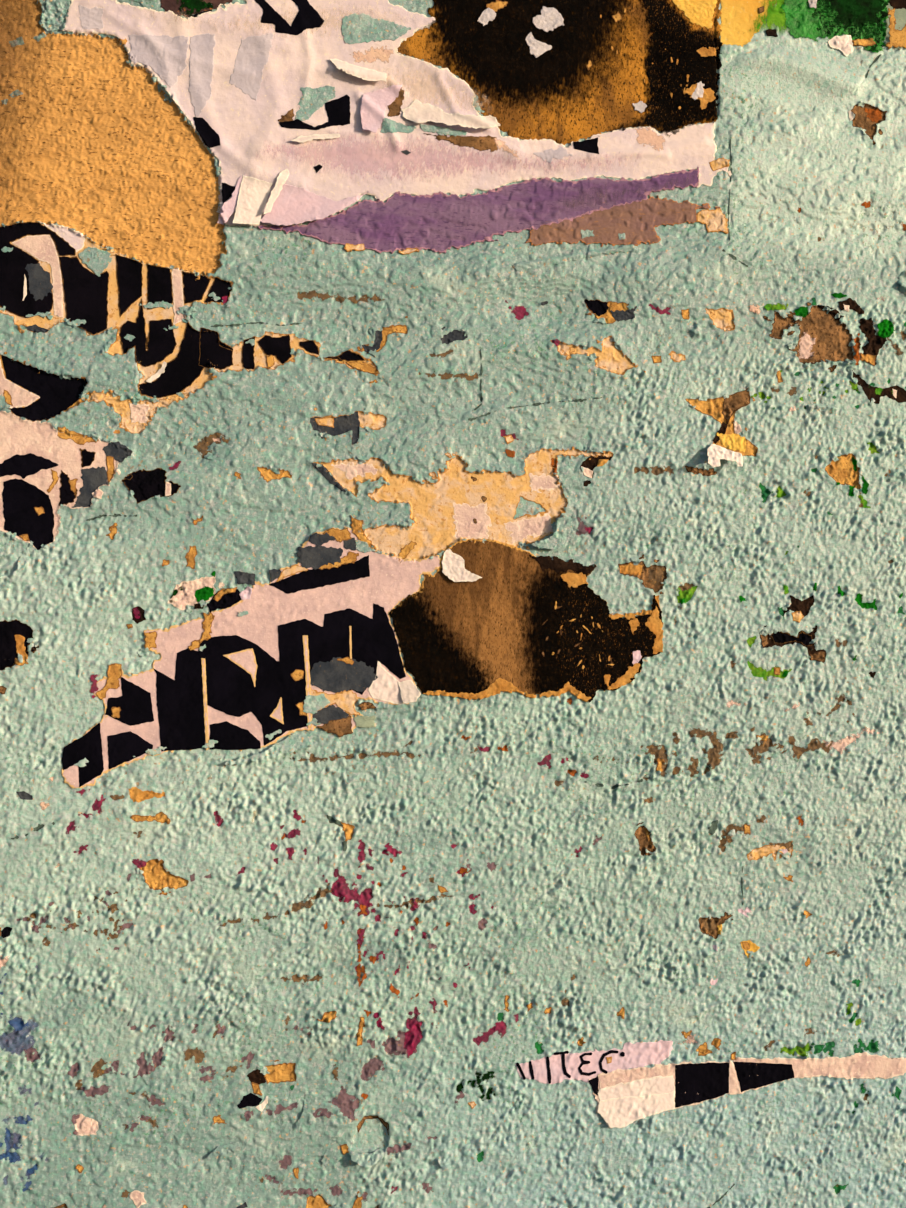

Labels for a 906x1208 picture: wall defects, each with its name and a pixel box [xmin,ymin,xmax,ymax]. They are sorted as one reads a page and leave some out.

spalling [0,0,227,280]
spalling [550,299,690,375]
peeling [705,308,735,336]
spalling [750,292,906,405]
peeling [87,389,189,434]
peeling [191,432,229,460]
peeling [122,461,181,504]
spalling [310,408,614,562]
peeling [126,606,146,629]
peeling [168,571,225,612]
spalling [618,554,698,607]
peeling [731,583,848,681]